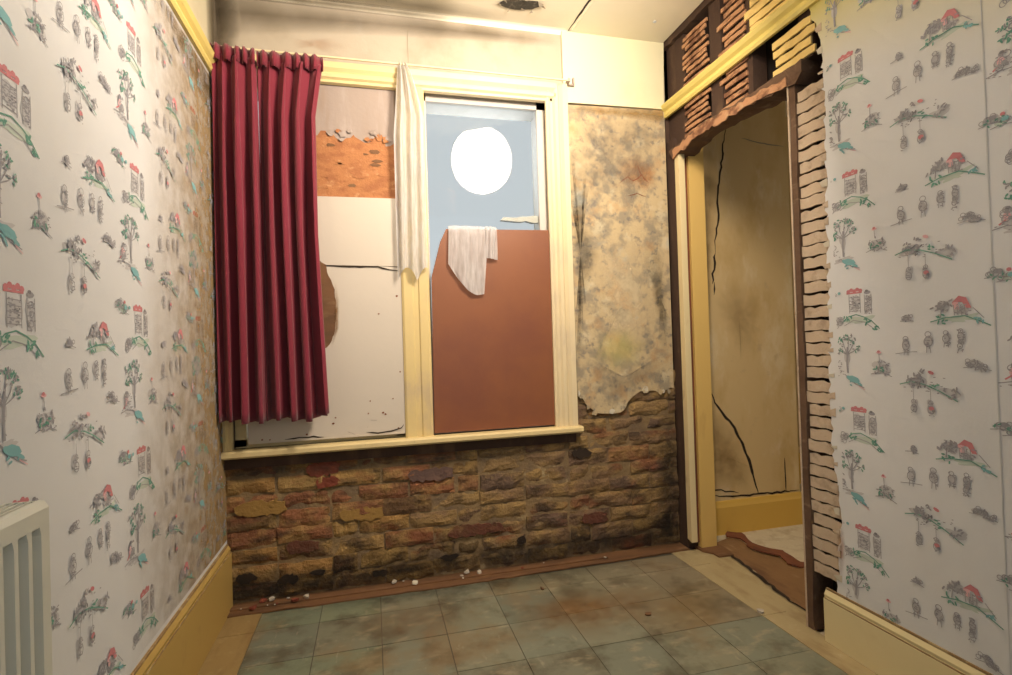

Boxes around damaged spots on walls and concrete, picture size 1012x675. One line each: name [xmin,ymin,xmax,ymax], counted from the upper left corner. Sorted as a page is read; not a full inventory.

damp [599,110,663,118]
peeling [316,128,395,199]
crack [711,129,784,294]
spalling [571,447,592,459]
crack [712,394,797,497]
spalling [306,461,341,489]
spalling [277,569,326,584]